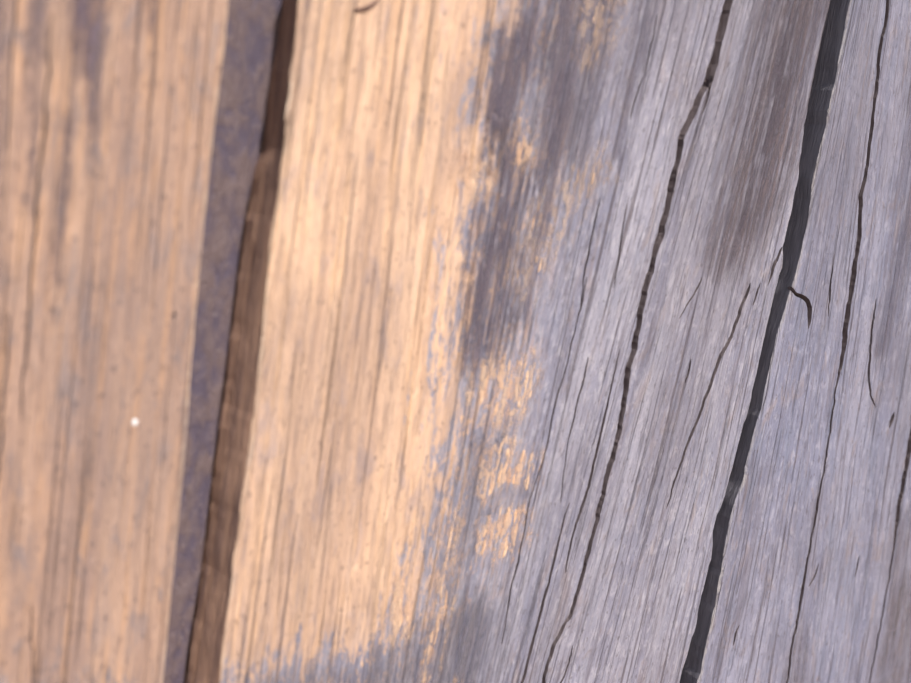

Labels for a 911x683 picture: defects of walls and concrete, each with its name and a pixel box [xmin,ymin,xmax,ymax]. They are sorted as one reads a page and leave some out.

crack [501,0,733,683]
crack [666,0,889,683]
crack [869,428,911,683]